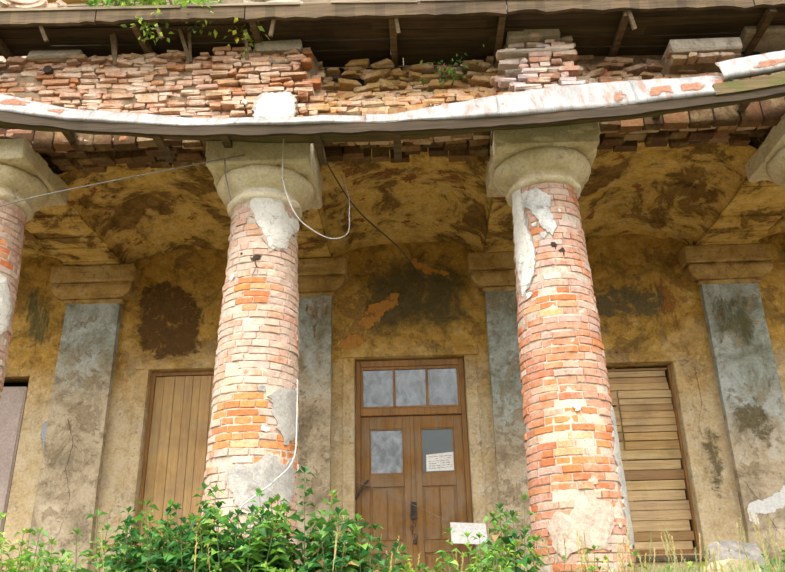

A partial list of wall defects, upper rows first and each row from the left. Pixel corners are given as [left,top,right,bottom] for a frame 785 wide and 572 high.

flaking render [243,90,298,118]
spalling [317,58,500,116]
spalling [585,57,663,82]
flaking render [240,188,300,261]
flaking render [512,187,577,317]
flaking render [0,239,14,337]
damp [134,281,204,360]
damp [594,285,665,318]
flaking render [212,385,299,471]
flaking render [534,403,613,473]
flaking render [546,494,623,559]
spalling [747,485,785,525]